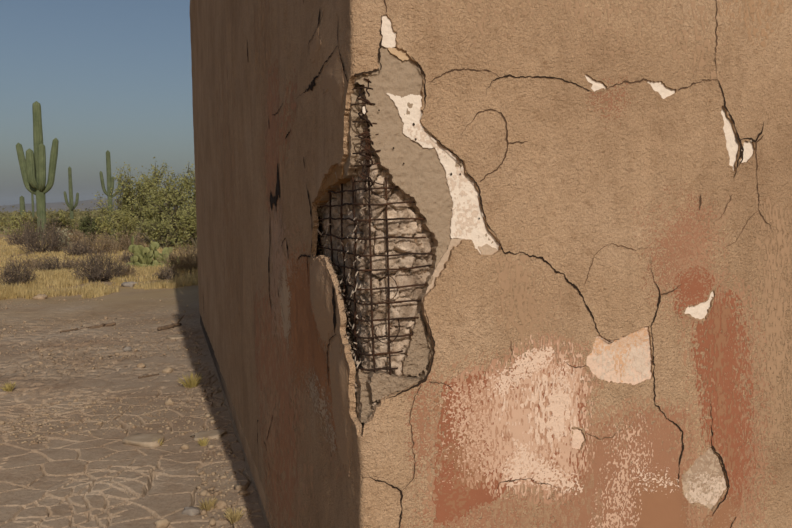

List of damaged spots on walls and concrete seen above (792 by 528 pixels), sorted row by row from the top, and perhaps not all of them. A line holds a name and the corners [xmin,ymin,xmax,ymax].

spalling [585,74,606,92]
spalling [647,81,675,99]
crack [678,1,772,249]
spalling [721,107,754,170]
crack [362,310,452,528]
crack [494,478,561,495]
crack [412,57,684,488]
damp [434,245,726,528]
corrosion [398,264,770,528]
spalling [586,327,652,385]
spalling [684,291,714,319]
crack [711,406,730,514]